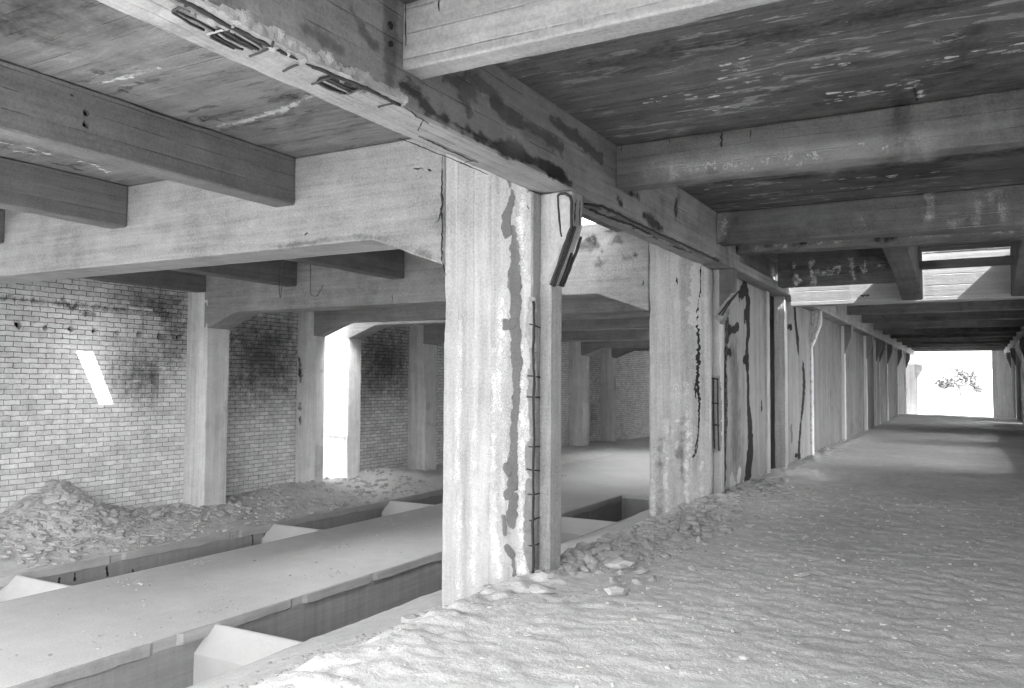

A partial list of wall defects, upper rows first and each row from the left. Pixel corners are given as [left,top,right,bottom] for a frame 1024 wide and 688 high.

spalling [168,0,408,108]
spalling [522,297,541,573]
crack [574,203,702,458]
spalling [539,192,739,331]